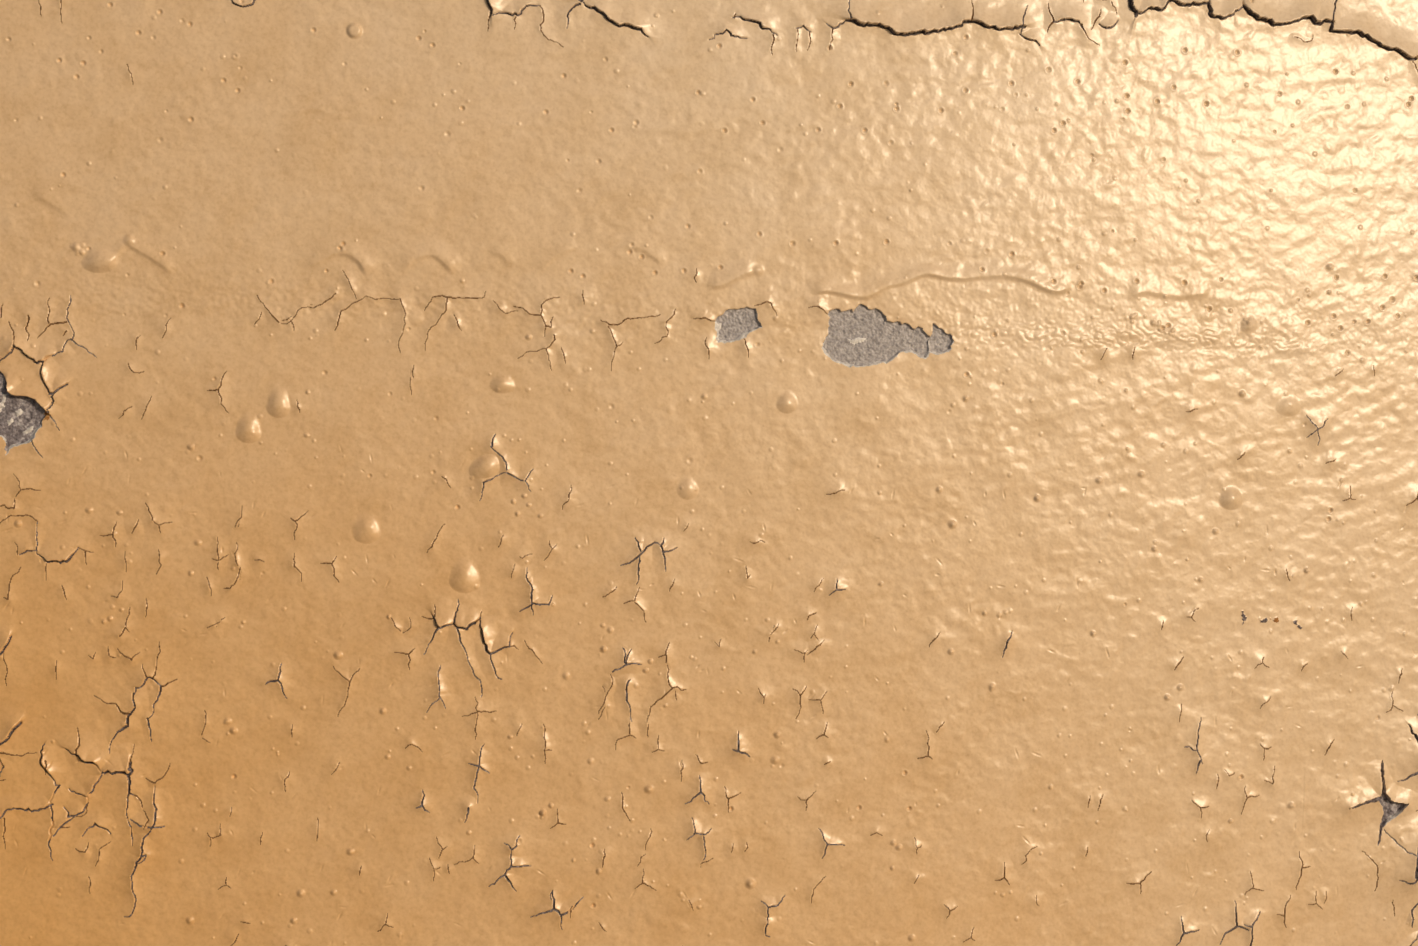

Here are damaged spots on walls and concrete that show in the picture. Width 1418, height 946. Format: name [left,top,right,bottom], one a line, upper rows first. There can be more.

peeling [479,0,563,47]
peeling [567,0,663,44]
peeling [701,0,1418,72]
peeling [0,295,97,458]
crack [252,266,829,397]
spalling [715,307,763,344]
spalling [822,304,955,368]
crack [424,431,574,666]
crack [53,500,175,682]
crack [1384,666,1406,715]
crack [331,521,977,945]
crack [1359,849,1418,930]